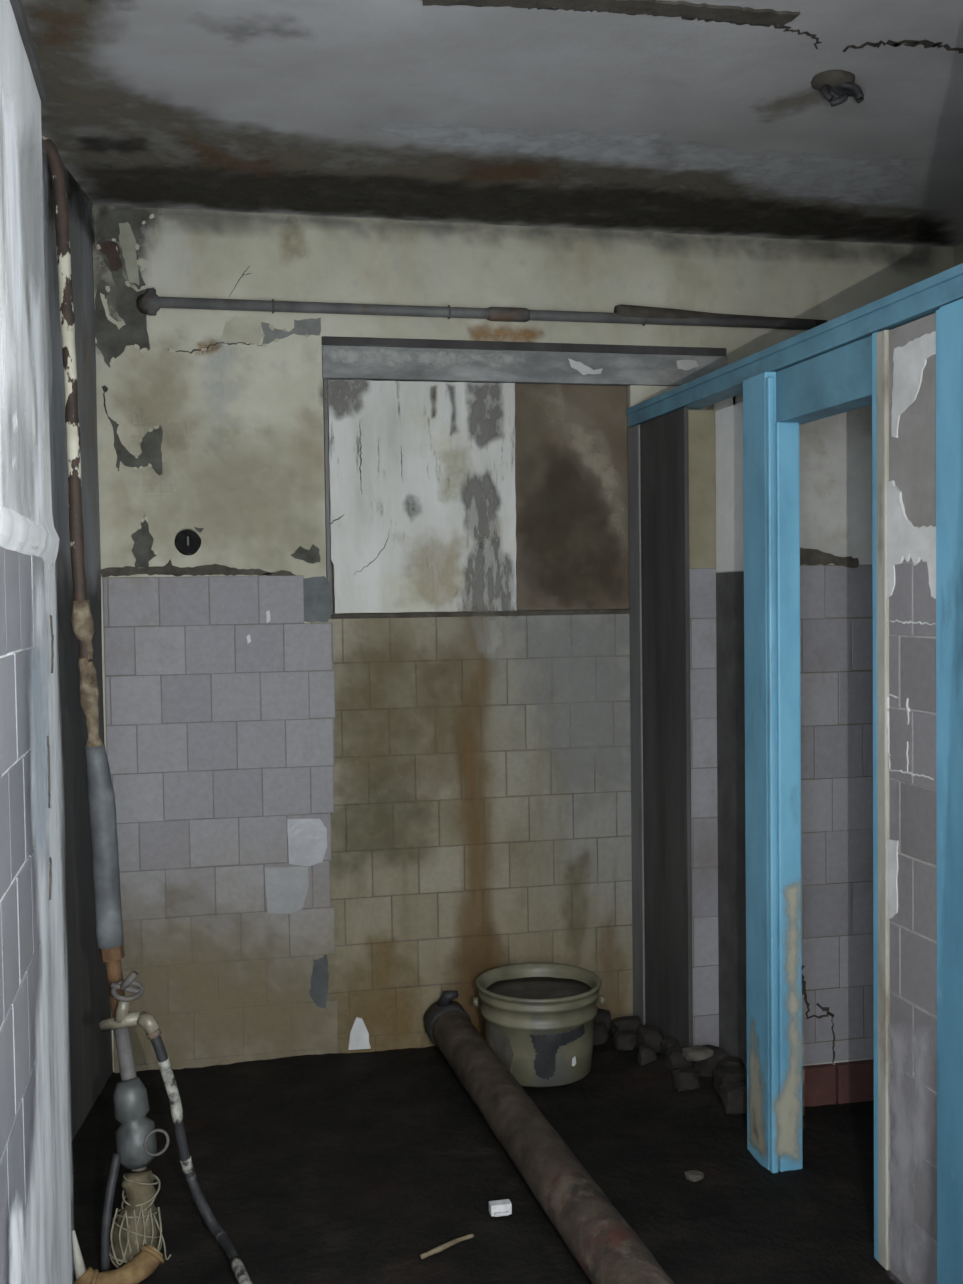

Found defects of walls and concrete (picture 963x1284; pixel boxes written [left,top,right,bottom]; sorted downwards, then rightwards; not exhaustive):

flaking render [422,0,800,26]
crack [528,8,963,53]
damp [26,0,949,322]
peeling [94,208,155,368]
peeling [891,331,936,438]
peeling [108,416,163,476]
damp [520,387,625,593]
crack [802,965,835,1065]